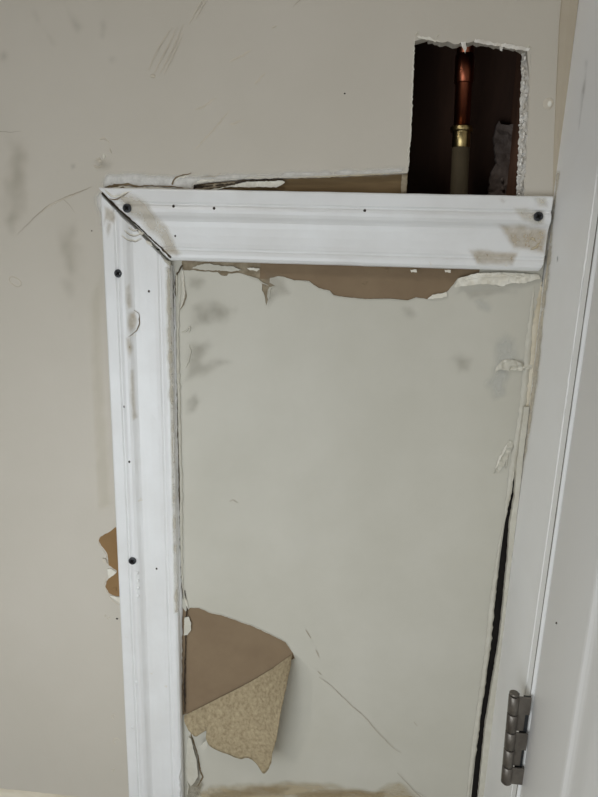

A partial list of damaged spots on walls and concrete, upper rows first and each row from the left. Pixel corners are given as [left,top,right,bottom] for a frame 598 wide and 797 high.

peeling [98,527,120,605]
crack [471,472,514,797]